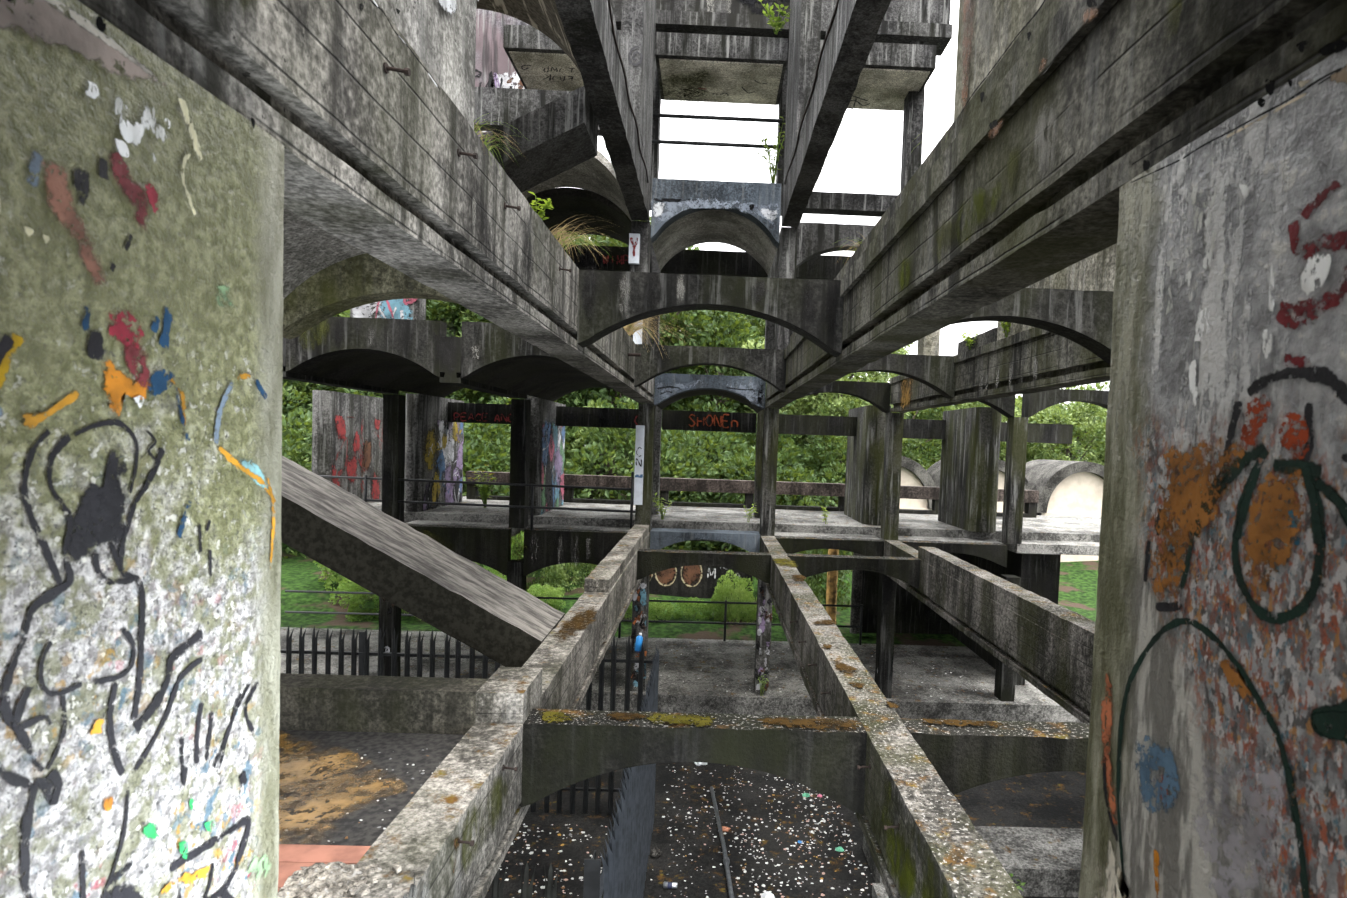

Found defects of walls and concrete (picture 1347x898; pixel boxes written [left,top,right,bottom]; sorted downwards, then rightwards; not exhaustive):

damp [708,0,790,15]
peeling [0,0,165,85]
spalling [1296,39,1347,83]
peeling [86,81,99,99]
spalling [1257,79,1310,107]
peeling [115,96,203,215]
damp [936,111,1070,260]
peeling [24,226,50,244]